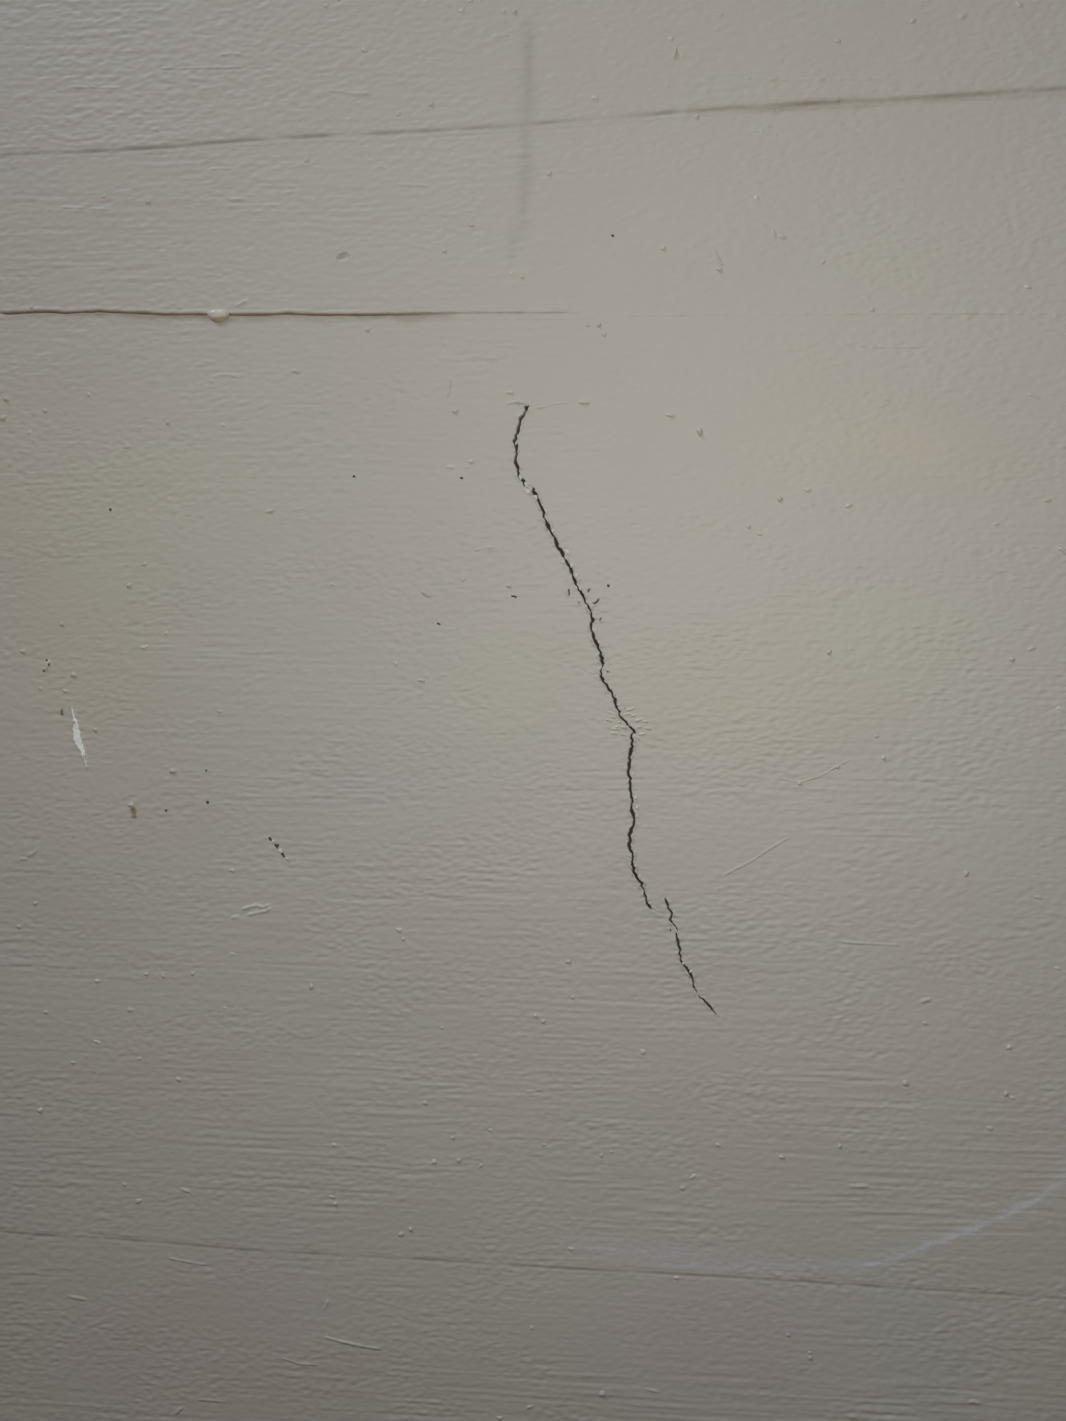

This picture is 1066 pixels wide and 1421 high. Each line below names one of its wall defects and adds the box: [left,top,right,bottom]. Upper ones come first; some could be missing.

crack [508,399,727,1029]